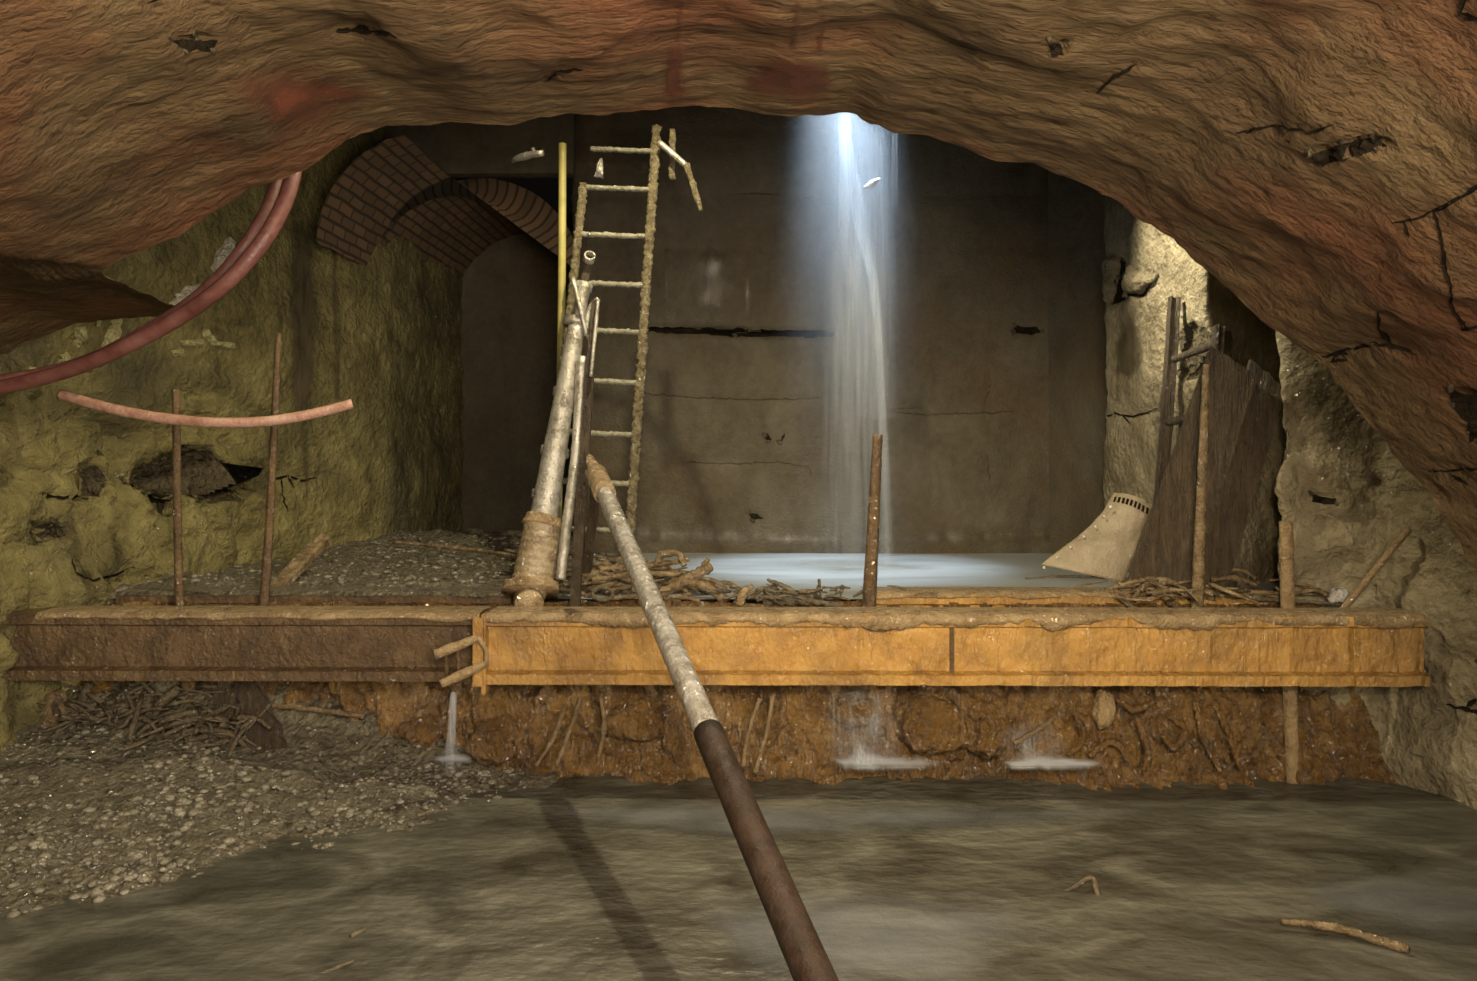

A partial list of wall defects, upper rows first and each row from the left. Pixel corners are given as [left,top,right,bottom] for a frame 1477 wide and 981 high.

crack [1458,0,1477,21]
crack [1236,124,1331,143]
crack [1392,185,1477,331]
crack [1116,274,1159,304]
crack [1322,312,1417,362]
crack [1446,698,1477,714]